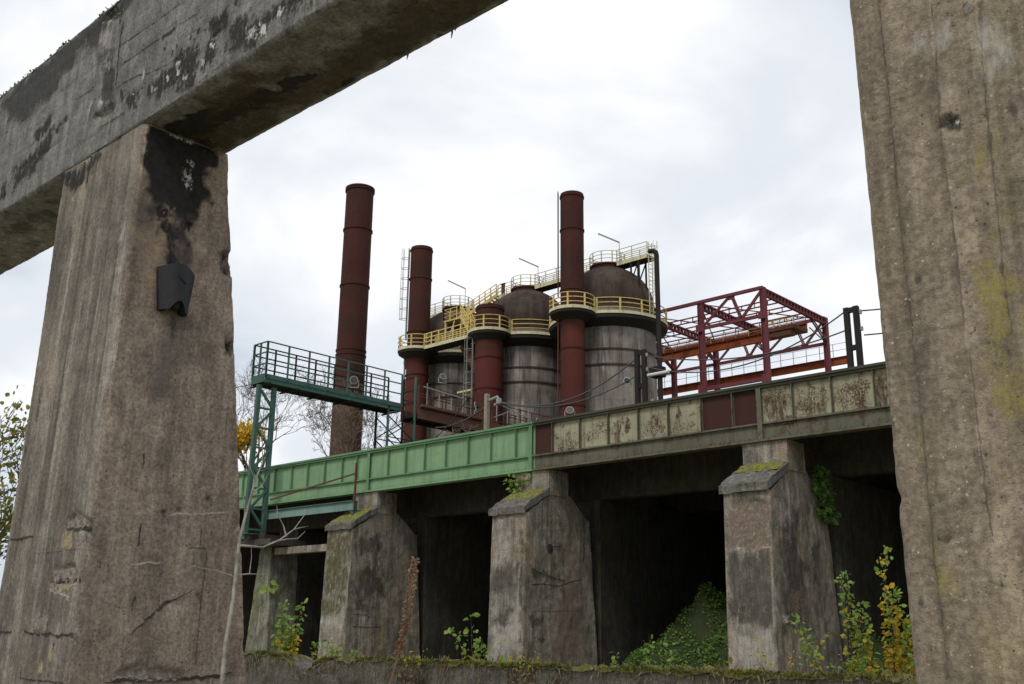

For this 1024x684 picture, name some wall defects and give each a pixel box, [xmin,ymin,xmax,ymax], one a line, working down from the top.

leakage [3,0,131,123]
spalling [939,113,961,129]
leakage [156,208,185,265]
corrosion [762,373,888,427]
corrosion [557,418,630,457]
spalling [50,564,80,599]
crack [130,525,207,664]
leakage [490,534,548,642]
crack [0,630,75,684]